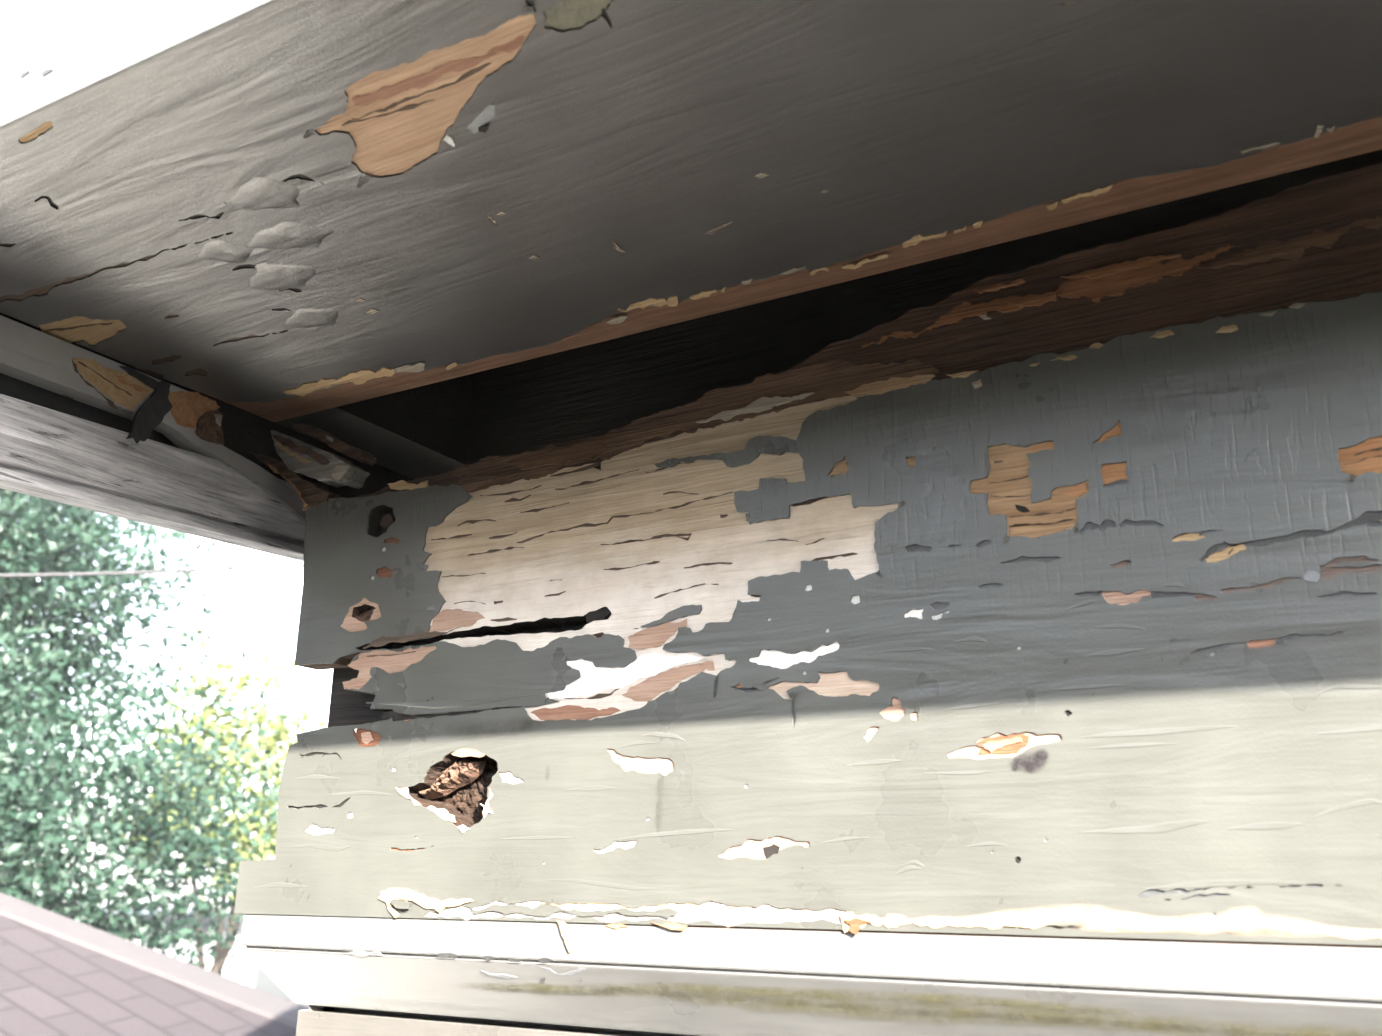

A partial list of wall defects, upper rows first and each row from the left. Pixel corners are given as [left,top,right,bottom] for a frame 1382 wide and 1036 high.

peeling [303,0,611,188]
peeling [38,316,225,445]
peeling [970,441,1129,543]
peeling [343,394,921,742]
crack [906,519,1164,589]
crack [1075,589,1102,597]
crack [1151,511,1382,601]
crack [359,607,611,650]
crack [1191,631,1345,654]
peeling [947,732,1063,760]
peeling [719,836,810,859]
peeling [378,887,1058,935]